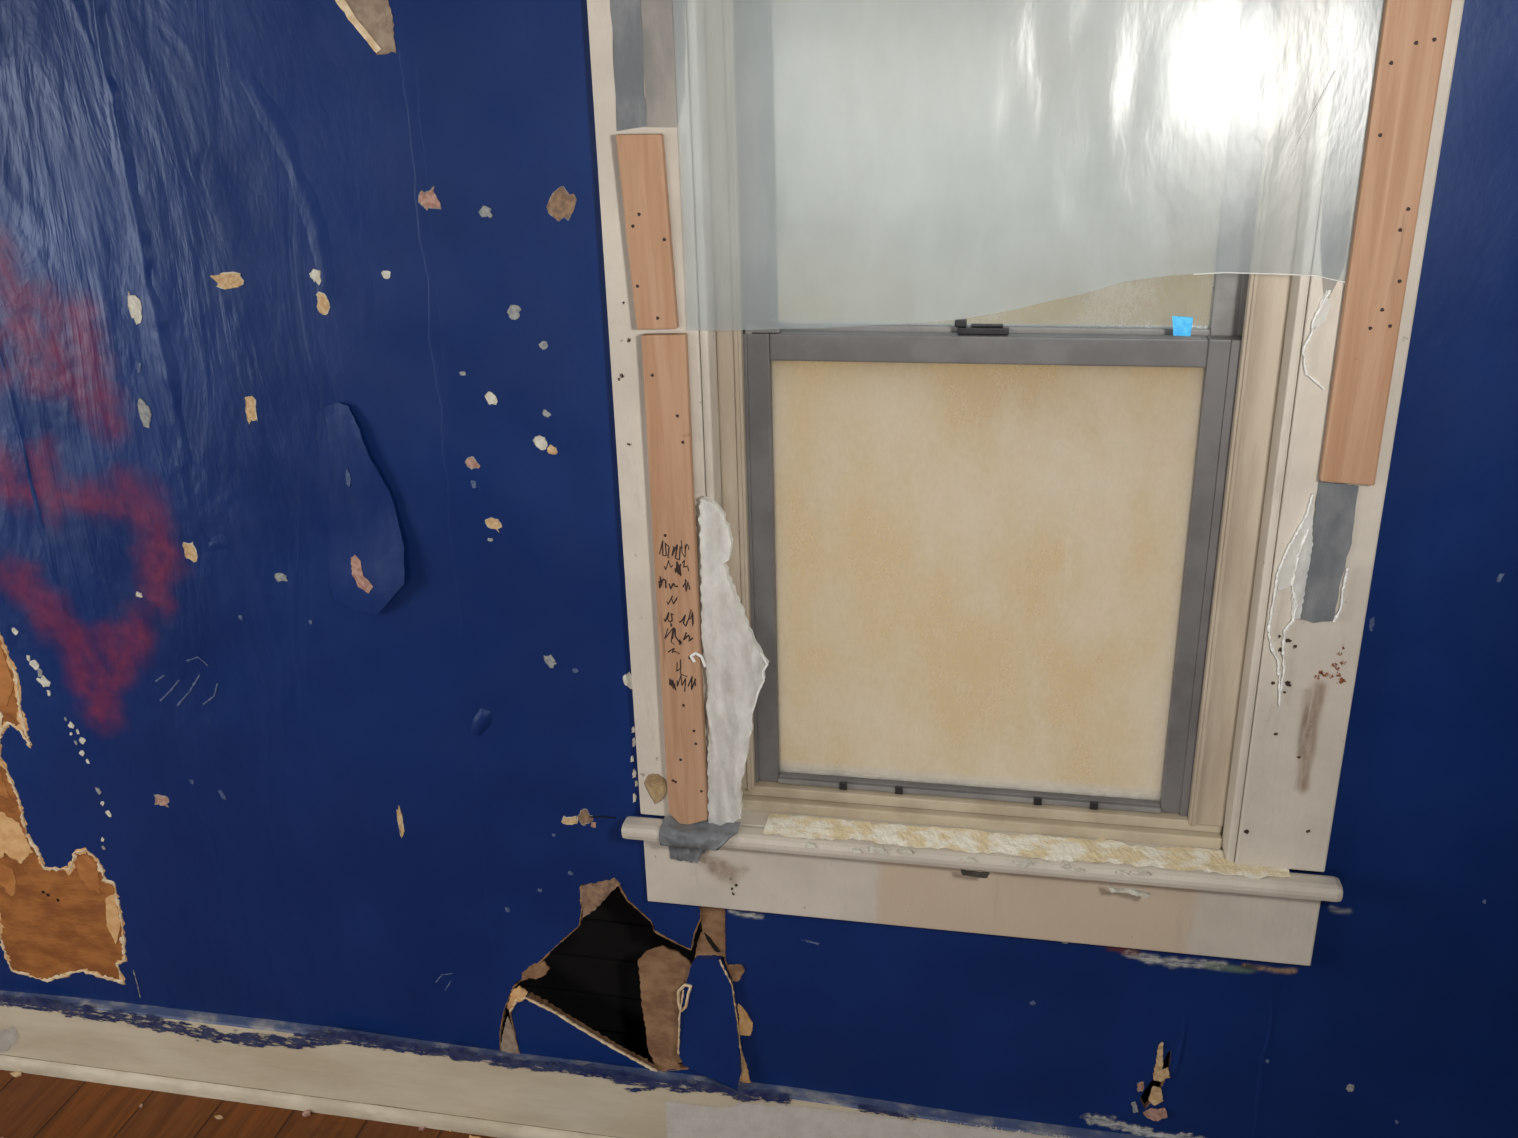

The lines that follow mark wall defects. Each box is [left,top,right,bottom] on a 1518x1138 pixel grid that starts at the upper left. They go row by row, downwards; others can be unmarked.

peeling [26,655,51,696]
peeling [64,717,90,764]
spalling [500,871,753,1090]
spalling [1131,1016,1188,1122]